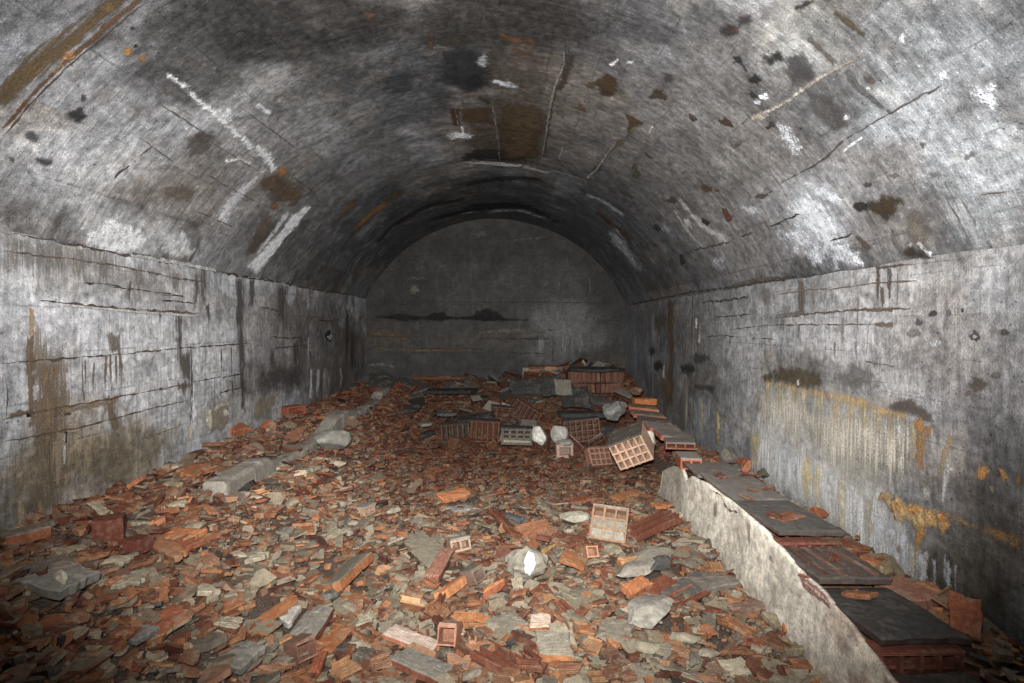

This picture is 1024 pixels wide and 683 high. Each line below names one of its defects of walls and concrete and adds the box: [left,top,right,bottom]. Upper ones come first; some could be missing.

leakage [155,74,277,224]
leakage [448,126,471,140]
crack [542,34,574,159]
crack [780,85,941,184]
crack [4,103,1017,383]
leakage [777,178,902,307]
crack [3,343,247,441]
leakage [175,313,213,439]
leakage [761,367,821,389]
leakage [751,427,957,588]
rust [761,378,1022,550]
leakage [890,388,931,439]